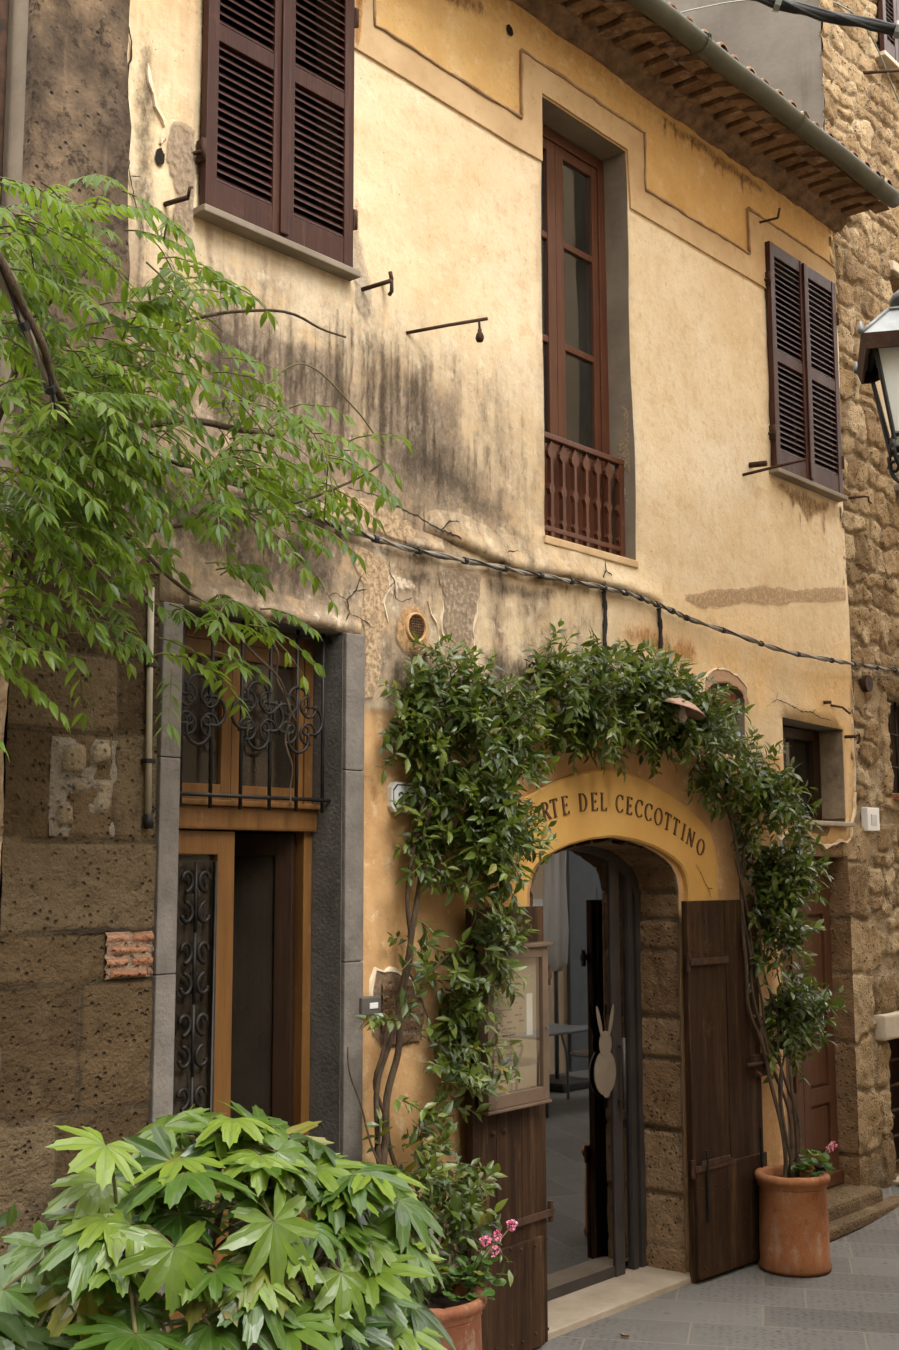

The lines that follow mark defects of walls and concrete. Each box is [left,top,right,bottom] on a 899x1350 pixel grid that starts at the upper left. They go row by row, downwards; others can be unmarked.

damp [200,285,497,515]
crack [329,562,412,628]
spalling [48,736,118,837]
spalling [104,931,154,980]